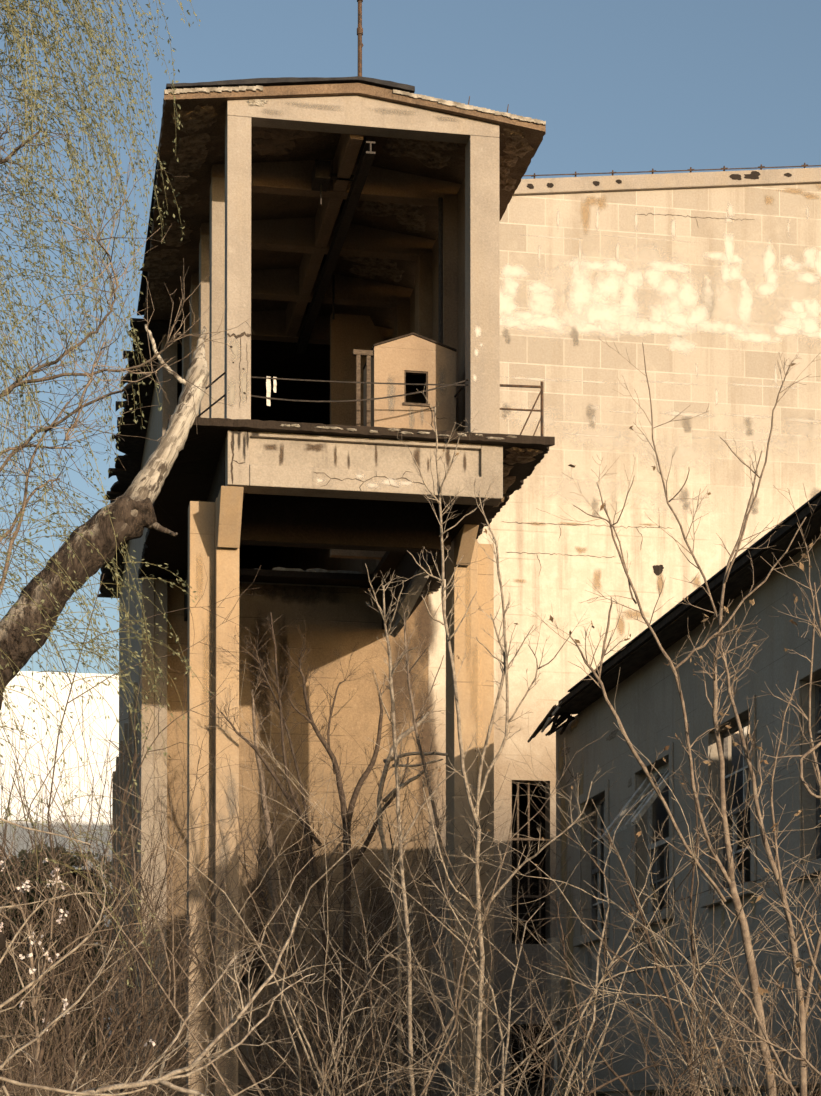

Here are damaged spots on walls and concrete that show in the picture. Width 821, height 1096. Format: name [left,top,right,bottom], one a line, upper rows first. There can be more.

peeling [155,104,220,207]
peeling [499,129,534,206]
spalling [729,171,761,180]
peeling [140,219,193,279]
leakage [500,212,821,351]
crack [314,471,425,492]